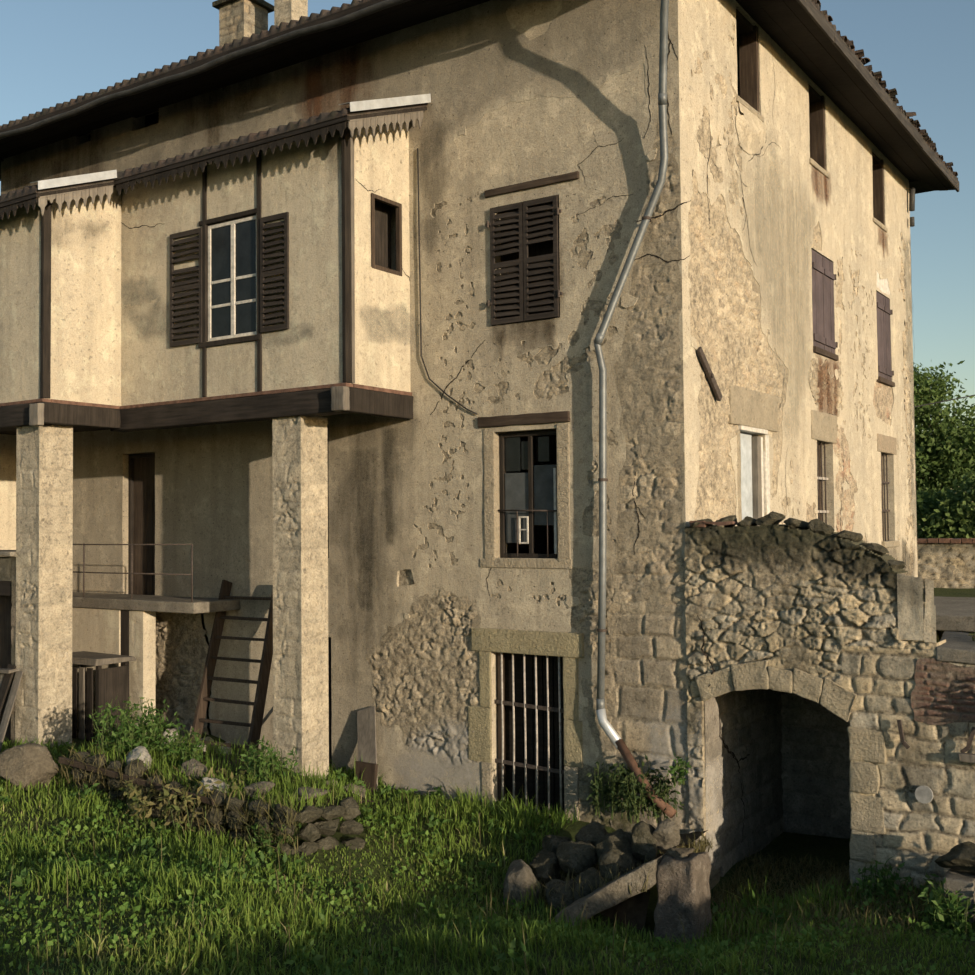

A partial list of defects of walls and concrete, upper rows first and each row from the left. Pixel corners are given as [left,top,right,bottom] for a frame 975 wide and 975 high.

peeling [454,63,647,174]
crack [577,33,678,178]
crack [634,123,780,264]
spalling [437,219,475,340]
spalling [399,347,520,586]
spalling [517,72,818,834]
spalling [808,232,914,576]
spalling [365,587,481,771]
crack [719,711,750,843]